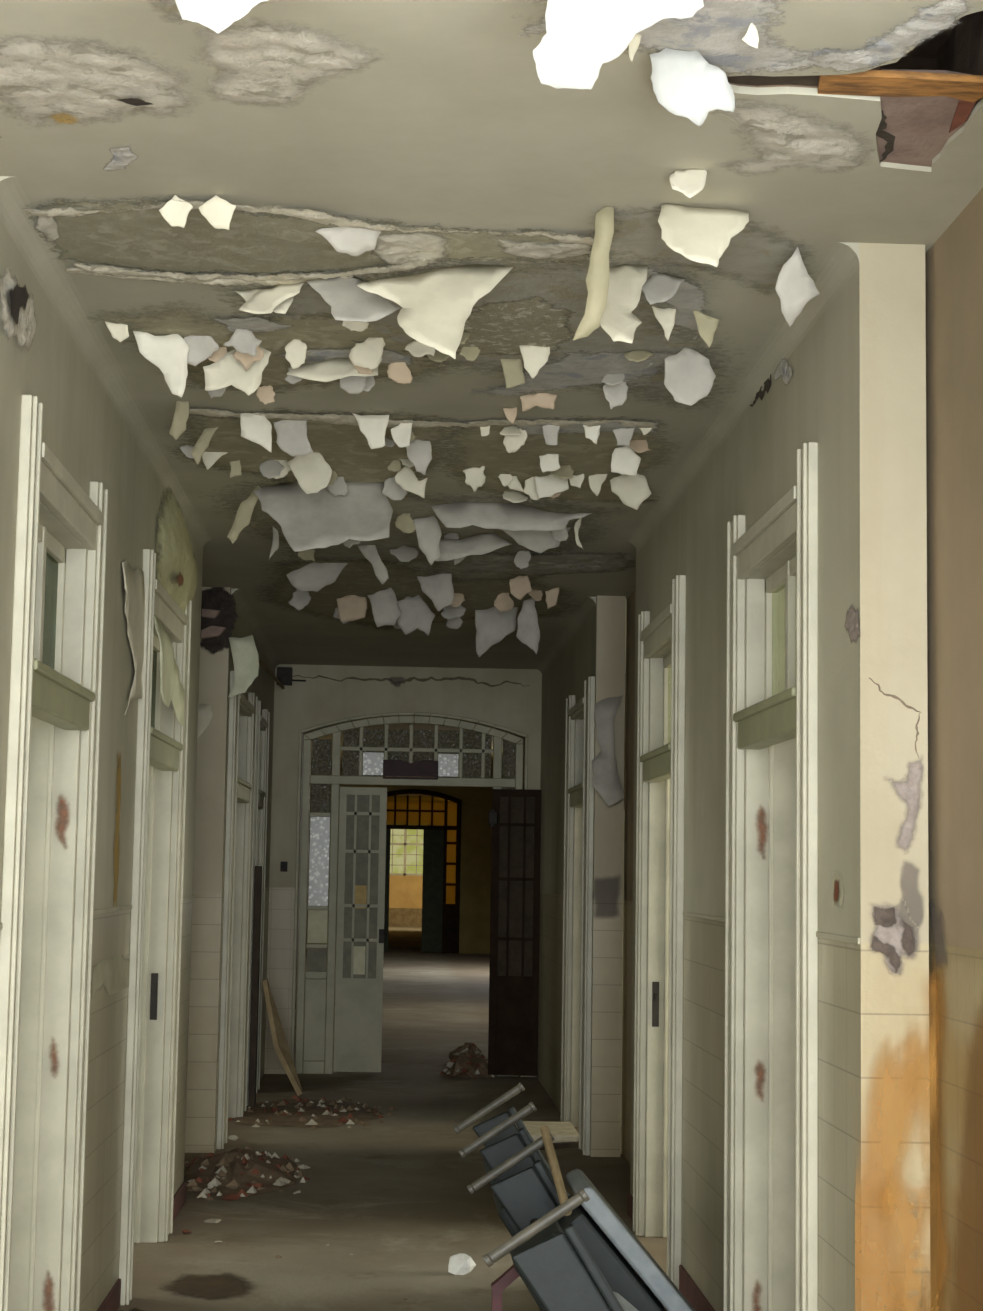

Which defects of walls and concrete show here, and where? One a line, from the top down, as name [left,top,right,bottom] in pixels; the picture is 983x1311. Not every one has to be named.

spalling [0,0,379,125]
peeling [520,0,972,174]
spalling [0,269,37,350]
peeling [24,169,820,657]
peeling [122,560,213,739]
crack [869,677,921,758]
spalling [892,761,923,849]
spalling [871,906,915,973]
rust [855,906,947,1311]